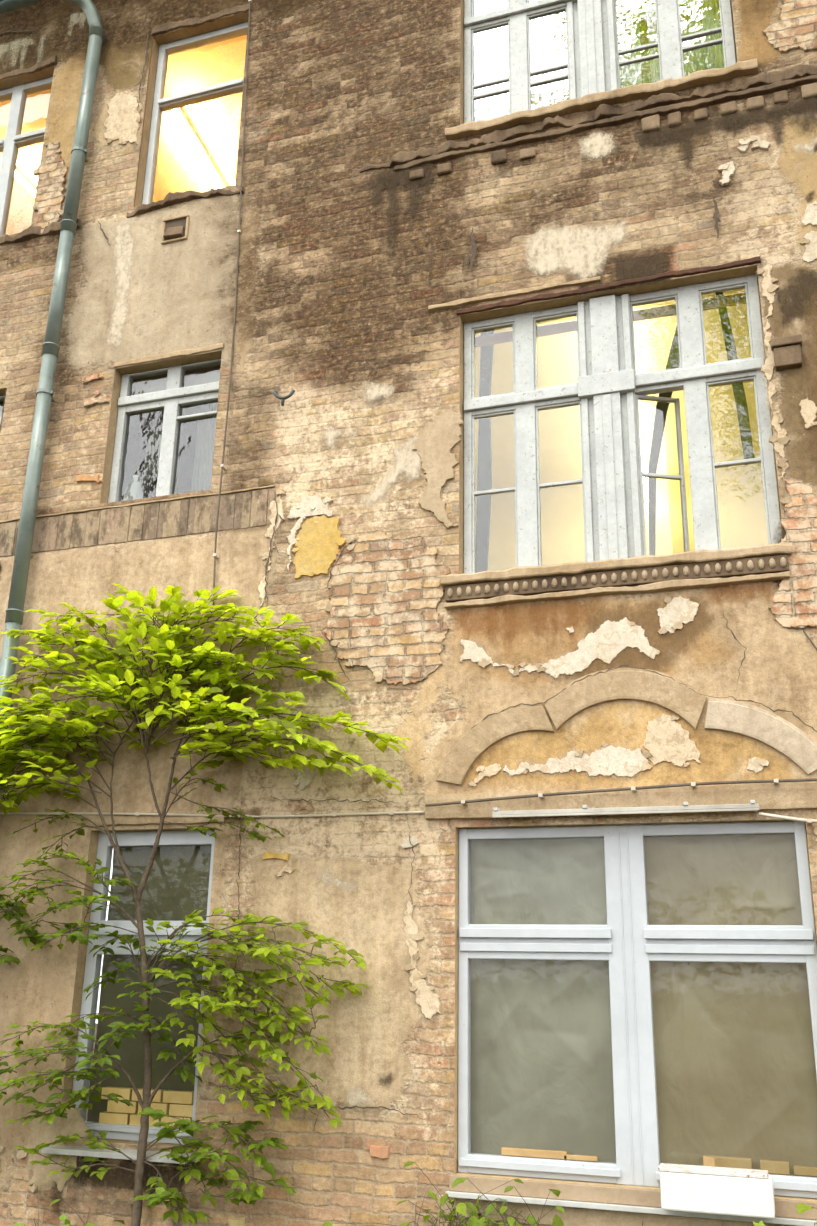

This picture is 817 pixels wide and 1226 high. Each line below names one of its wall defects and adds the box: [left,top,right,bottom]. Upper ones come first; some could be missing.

flaking render [762,0,817,53]
flaking render [32,141,68,237]
damp [369,163,431,254]
flaking render [718,135,770,187]
flaking render [800,201,817,263]
damp [778,270,817,415]
flaking render [755,264,817,629]
flaking render [258,490,334,606]
flaking render [323,530,700,686]
crack [471,613,817,732]
flaking render [469,713,701,787]
flaking render [403,900,441,1020]